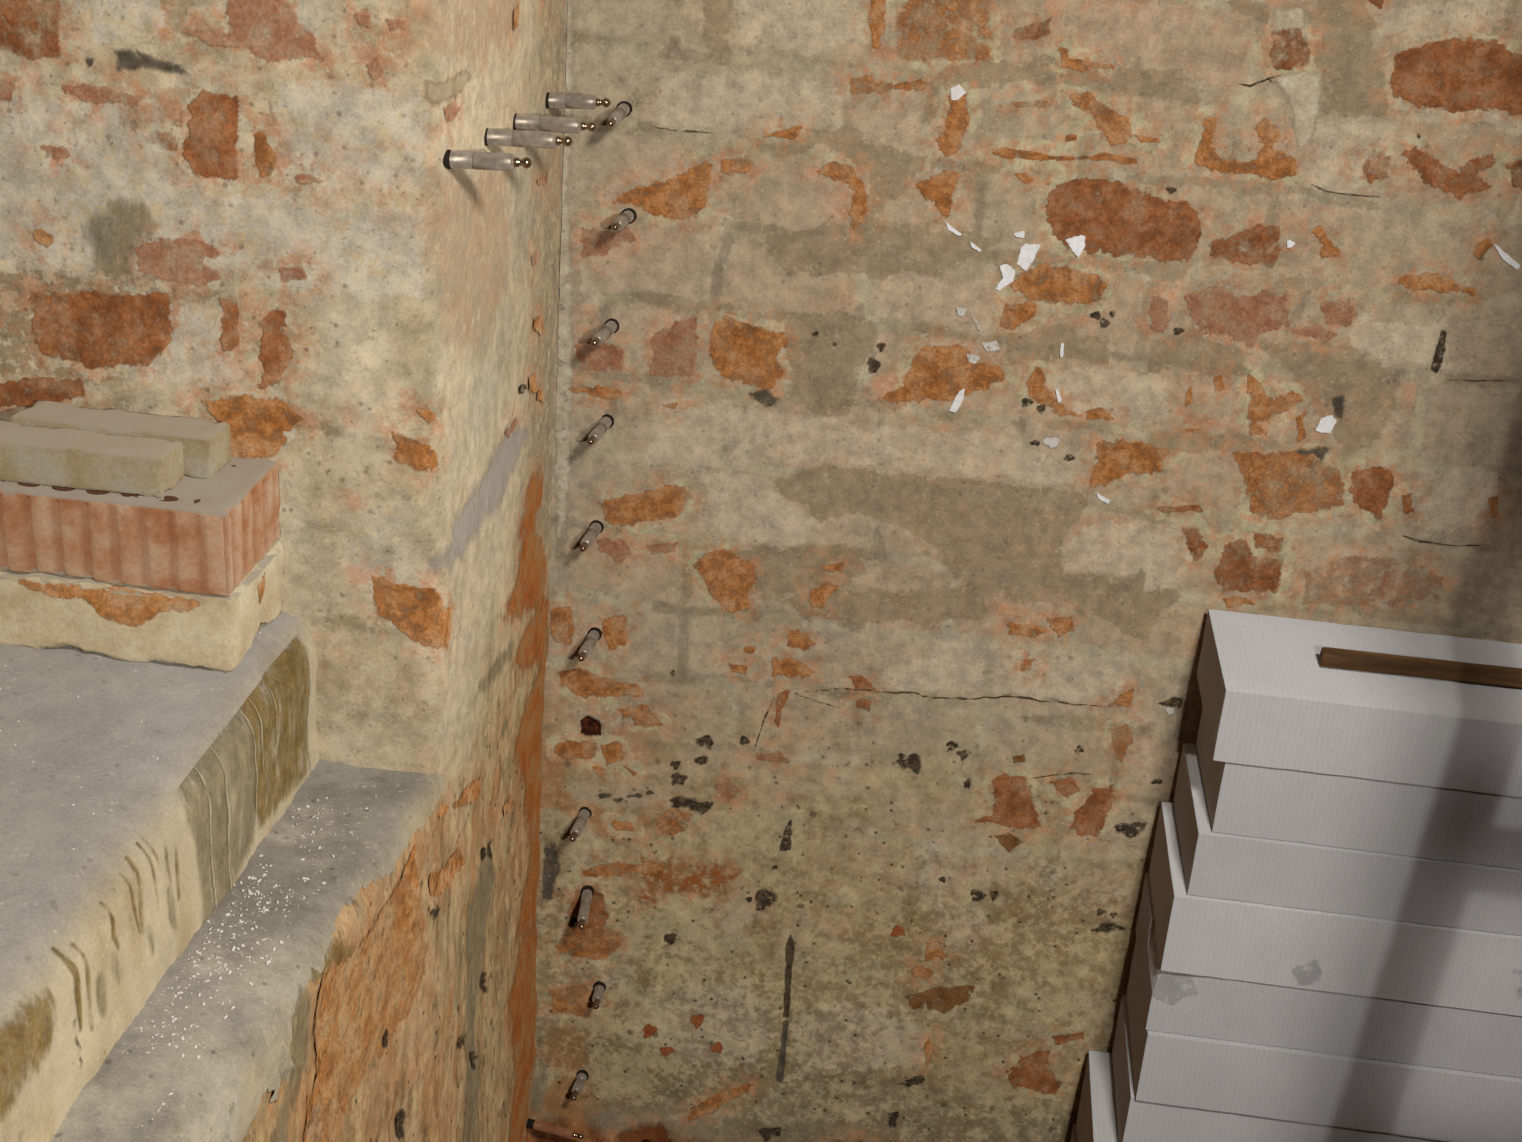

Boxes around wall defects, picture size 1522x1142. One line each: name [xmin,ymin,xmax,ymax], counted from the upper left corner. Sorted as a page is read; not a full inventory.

flaking render [1390,36,1522,115]
flaking render [157,89,276,181]
flaking render [992,91,1281,267]
flaking render [1194,117,1298,180]
flaking render [0,237,223,408]
flaking render [202,310,303,458]
flaking render [650,315,789,389]
flaking render [1001,263,1115,330]
flaking render [371,575,453,649]
crack [756,688,1097,745]
leakage [180,638,313,920]
flaking render [304,839,493,1142]